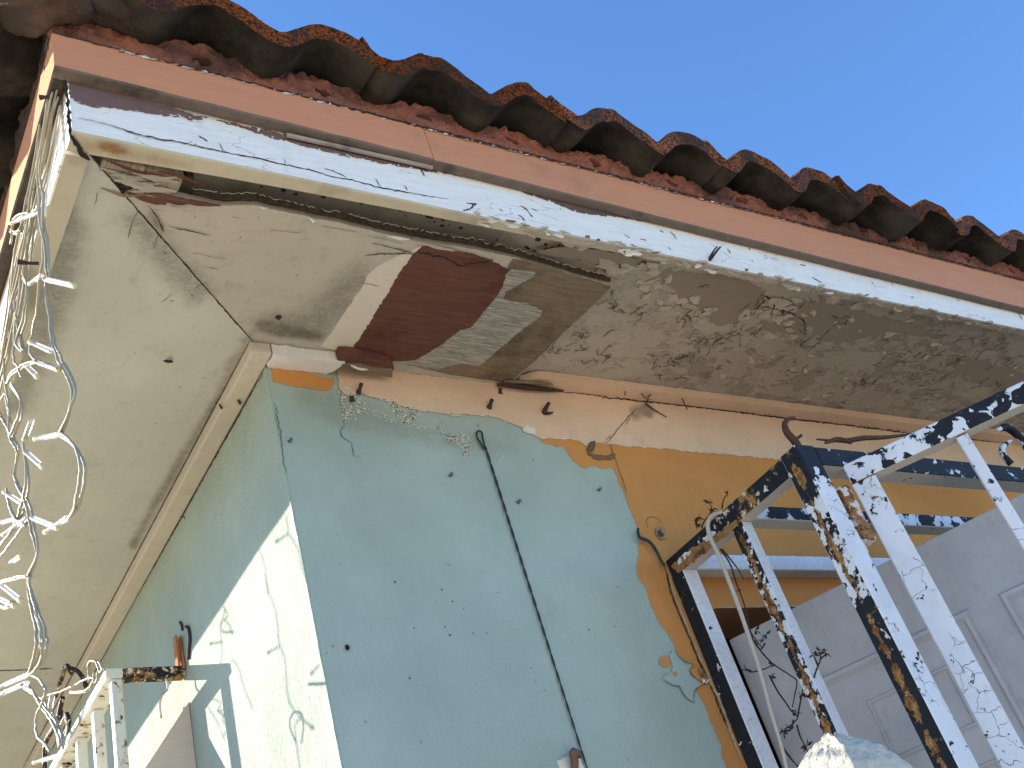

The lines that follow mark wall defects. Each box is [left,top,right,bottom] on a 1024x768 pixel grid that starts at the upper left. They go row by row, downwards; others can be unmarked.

peeling [119,49,258,86]
peeling [68,81,462,177]
crack [61,34,1024,280]
peeling [522,191,644,222]
peeling [321,246,542,370]
peeling [474,211,1006,360]
crack [744,295,807,331]
peeling [940,358,1024,392]
crack [2,80,476,765]
peeling [338,387,472,458]
spalling [656,526,667,540]
rust [671,520,739,573]